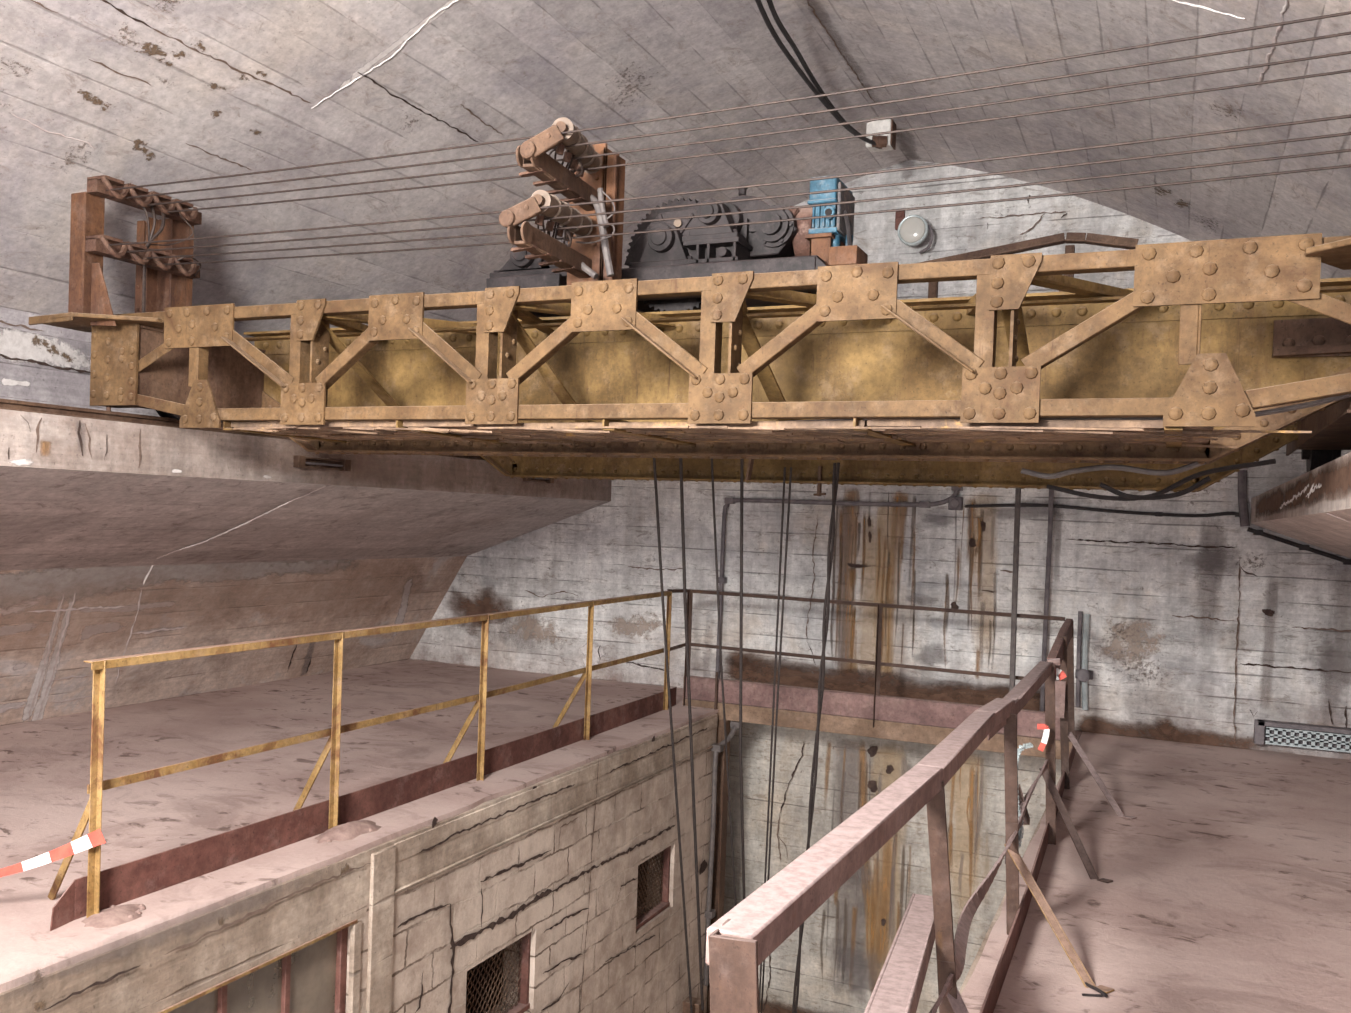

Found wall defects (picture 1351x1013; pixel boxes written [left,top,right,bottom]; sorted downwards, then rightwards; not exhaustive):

crack [89,59,150,85]
crack [102,0,503,142]
crack [807,0,875,103]
crack [1172,0,1245,19]
crack [1256,0,1287,88]
crack [186,143,251,170]
damp [451,589,508,631]
corrosion [830,491,916,671]
corrosion [858,751,867,810]
crack [398,727,709,1013]
corrosion [820,833,910,990]